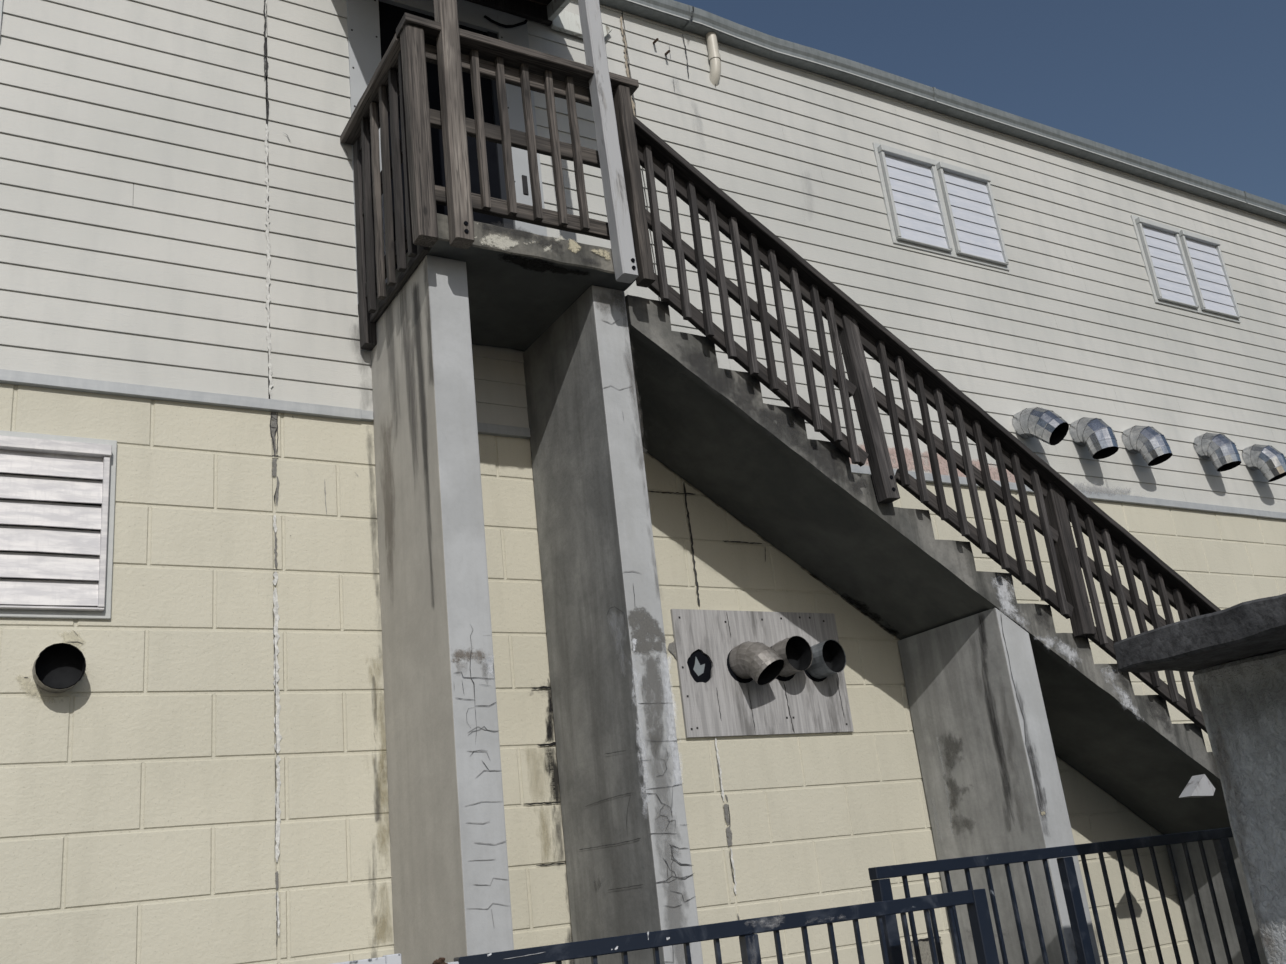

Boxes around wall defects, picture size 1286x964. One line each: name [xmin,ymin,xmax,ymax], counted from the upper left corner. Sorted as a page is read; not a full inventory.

crack [263,0,290,140]
peeling [474,223,611,259]
crack [649,483,700,606]
crack [272,588,282,945]
crack [455,626,509,924]
damp [526,685,560,805]
crack [579,740,694,907]
damp [624,570,681,784]
damp [945,735,969,827]